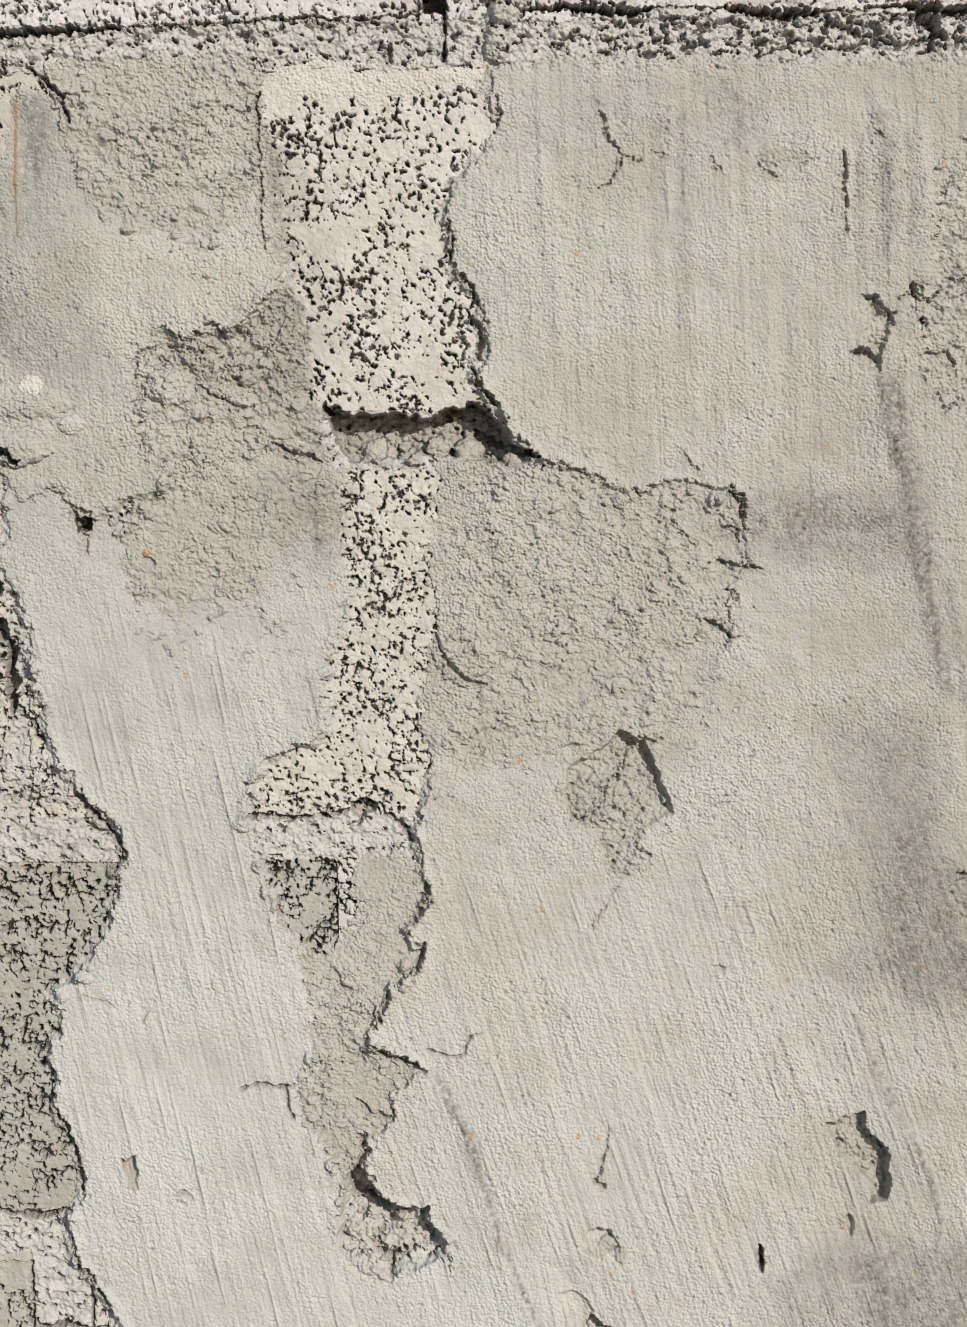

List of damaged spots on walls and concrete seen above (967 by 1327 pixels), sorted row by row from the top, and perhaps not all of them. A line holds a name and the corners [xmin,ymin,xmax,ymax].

crack [595,99,671,190]
crack [705,151,728,178]
spalling [148,269,314,413]
flaking render [44,732,139,892]
spalling [562,728,675,882]
flaking render [235,689,438,1077]
spalling [48,1099,87,1194]
spalling [121,1155,140,1192]
crack [238,1081,297,1122]
spalling [339,1132,457,1287]
spalling [825,1110,893,1205]
spalling [558,1290,611,1327]